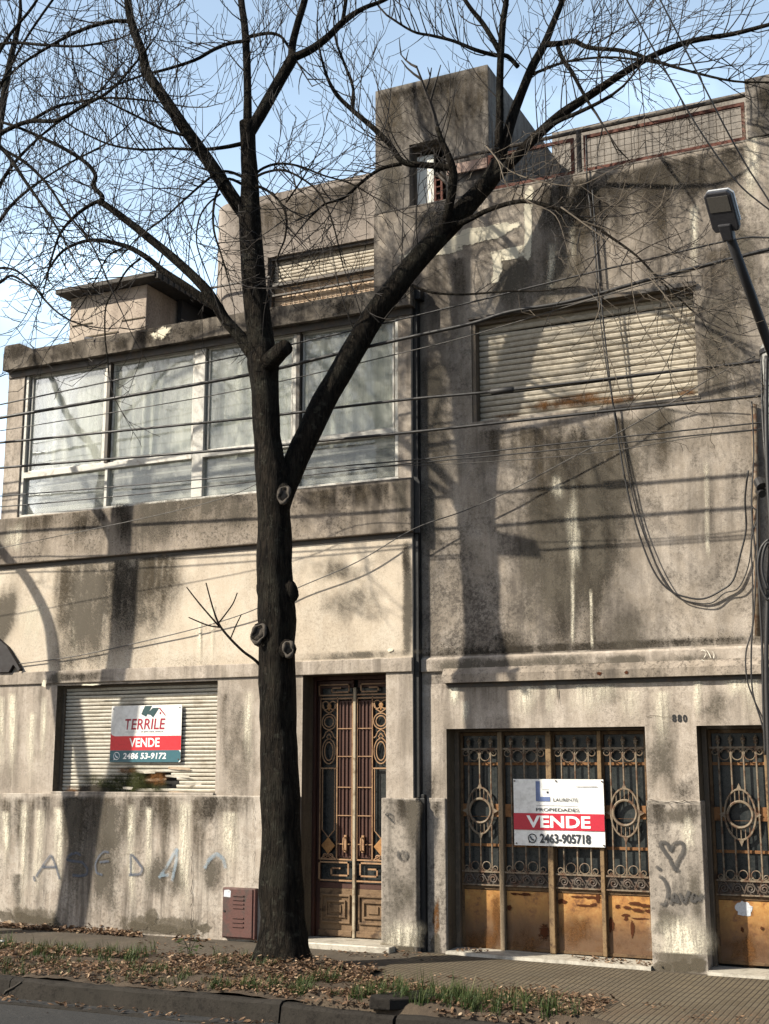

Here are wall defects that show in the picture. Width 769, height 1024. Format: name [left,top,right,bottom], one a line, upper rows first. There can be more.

corrosion [536,393,632,410]
water stain [425,409,756,670]
water stain [50,557,179,683]
water stain [313,651,383,659]
water stain [0,694,251,905]
corrosion [558,894,600,907]
corrosion [468,893,531,949]
corrosion [514,924,549,951]
corrosion [609,902,651,938]